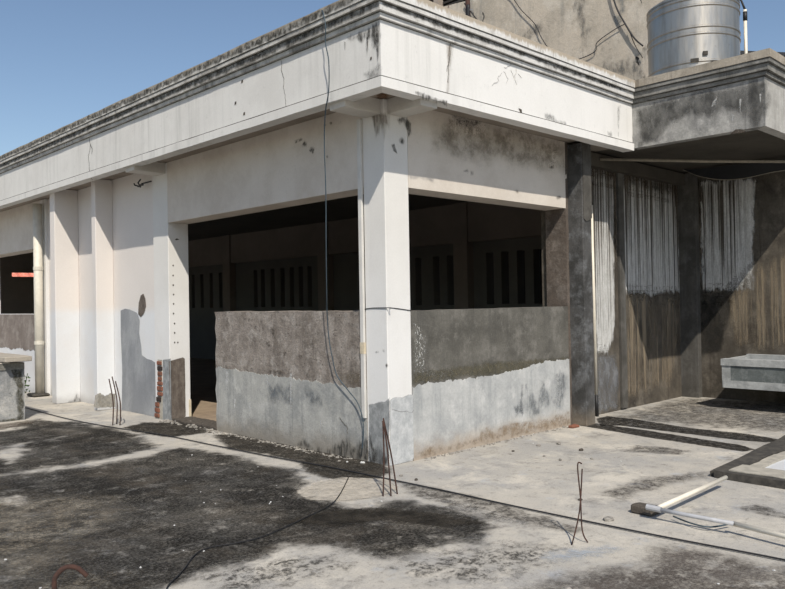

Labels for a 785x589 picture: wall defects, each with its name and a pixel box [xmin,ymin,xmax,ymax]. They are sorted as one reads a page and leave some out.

water stain [0,0,624,167]
water stain [638,83,769,142]
spalling [138,294,146,317]
water stain [591,168,681,395]
peeling [154,357,186,420]